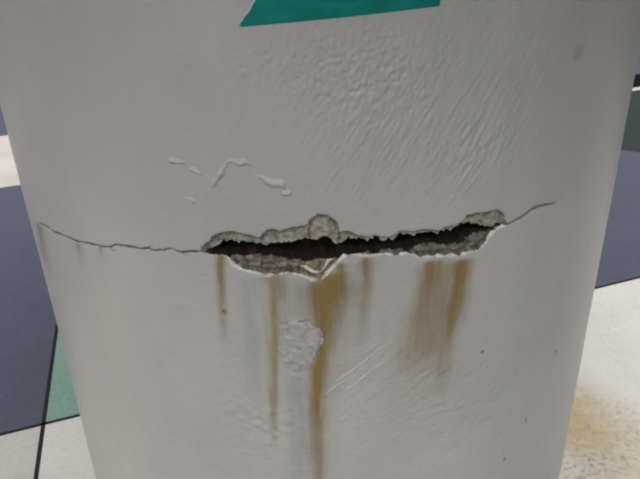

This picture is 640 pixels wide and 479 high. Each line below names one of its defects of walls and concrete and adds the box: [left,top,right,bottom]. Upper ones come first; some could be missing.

crack [39,222,206,255]
spalling [201,209,508,281]
crack [505,203,556,225]
corrosion [448,261,467,333]
corrosion [312,264,343,425]